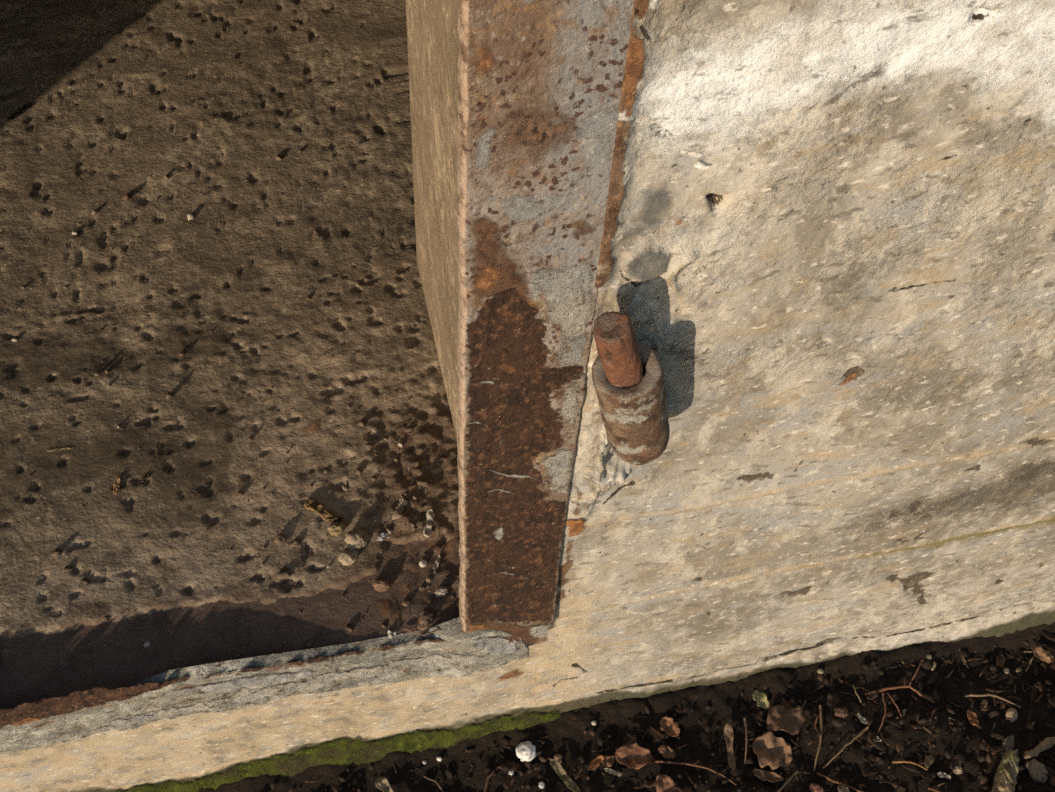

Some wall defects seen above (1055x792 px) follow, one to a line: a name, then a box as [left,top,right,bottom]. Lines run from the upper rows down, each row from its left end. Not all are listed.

corrosion [508,110,578,153]
corrosion [574,0,649,289]
corrosion [465,218,586,644]
corrosion [378,639,443,651]
corrosion [0,650,364,729]